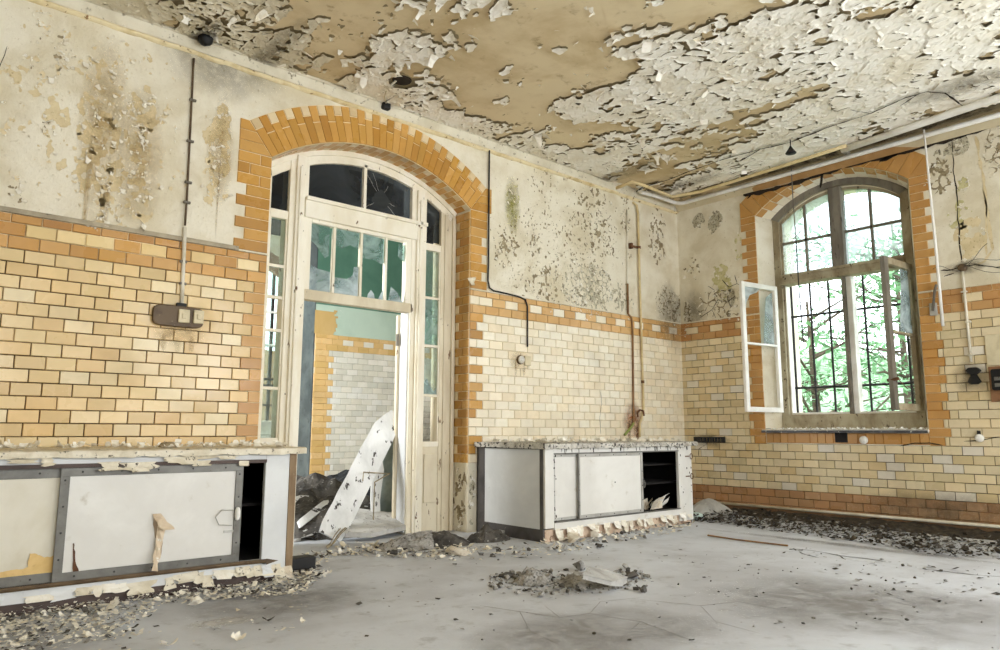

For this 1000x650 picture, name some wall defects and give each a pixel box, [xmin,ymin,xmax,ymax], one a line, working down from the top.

peeling [0,10,191,230]
peeling [87,0,1000,321]